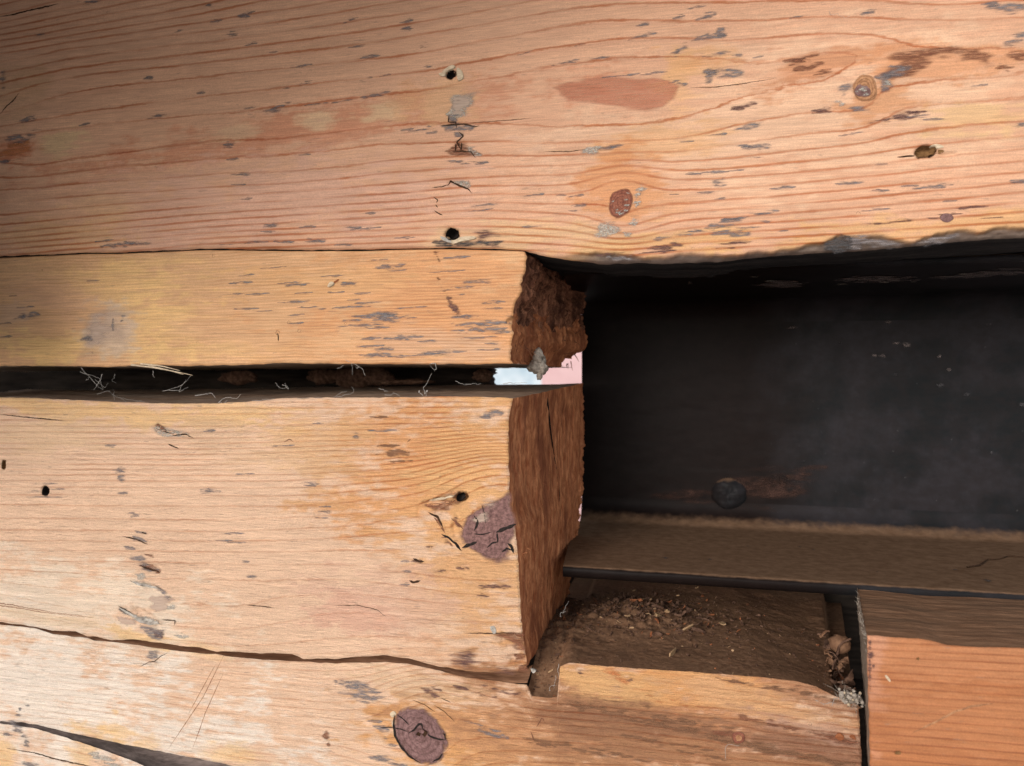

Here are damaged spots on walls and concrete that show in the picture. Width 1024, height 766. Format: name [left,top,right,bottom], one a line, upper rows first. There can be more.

crack [0,603,532,683]
crack [0,721,231,766]